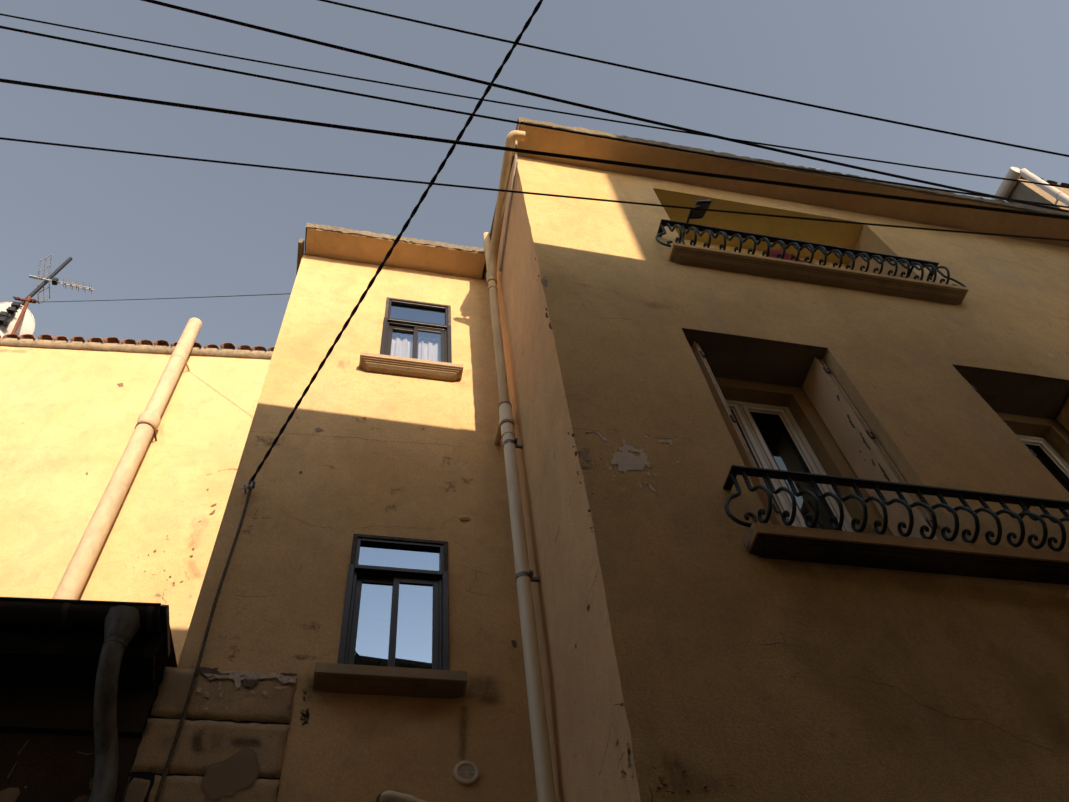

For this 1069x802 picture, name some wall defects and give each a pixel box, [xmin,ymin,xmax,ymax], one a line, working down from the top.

peeling [568,428,672,493]